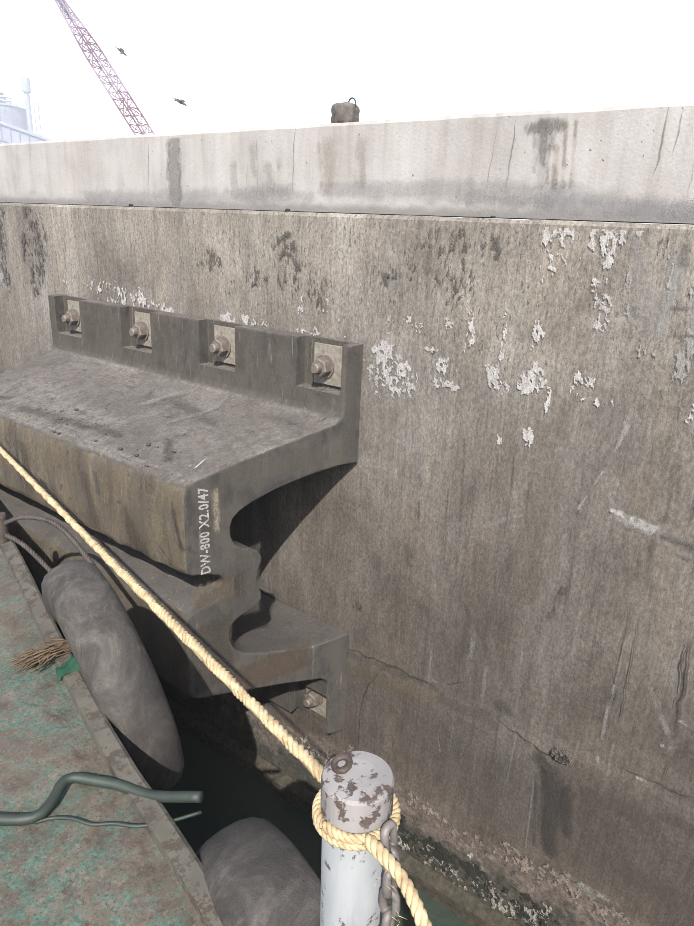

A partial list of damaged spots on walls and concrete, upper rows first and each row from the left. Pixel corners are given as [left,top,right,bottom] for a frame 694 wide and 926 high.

water stain [528,119,566,165]
peeling [540,227,575,283]
peeling [588,229,644,332]
peeling [363,316,423,398]
peeling [425,346,460,392]
peeling [485,309,552,413]
peeling [672,319,694,384]
peeling [522,427,534,447]
crack [350,649,460,685]
crack [675,643,691,715]